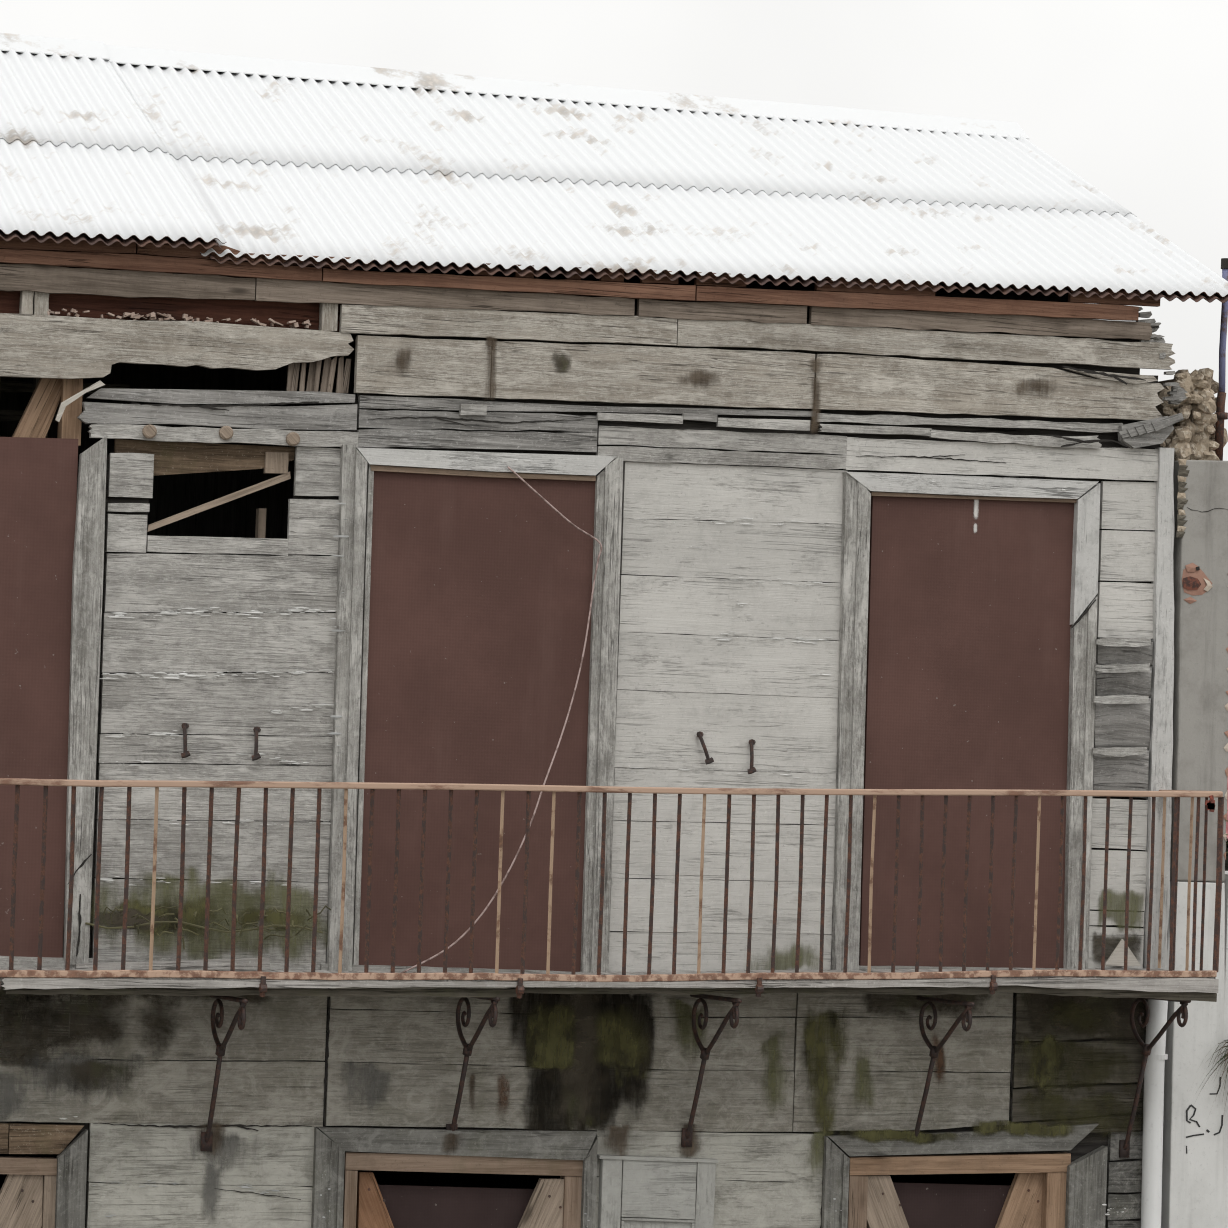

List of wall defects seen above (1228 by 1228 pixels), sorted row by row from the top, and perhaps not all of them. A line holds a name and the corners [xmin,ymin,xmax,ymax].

leakage [0,984,214,1119]
leakage [225,987,268,1003]
leakage [510,987,654,1156]
leakage [804,1010,871,1169]